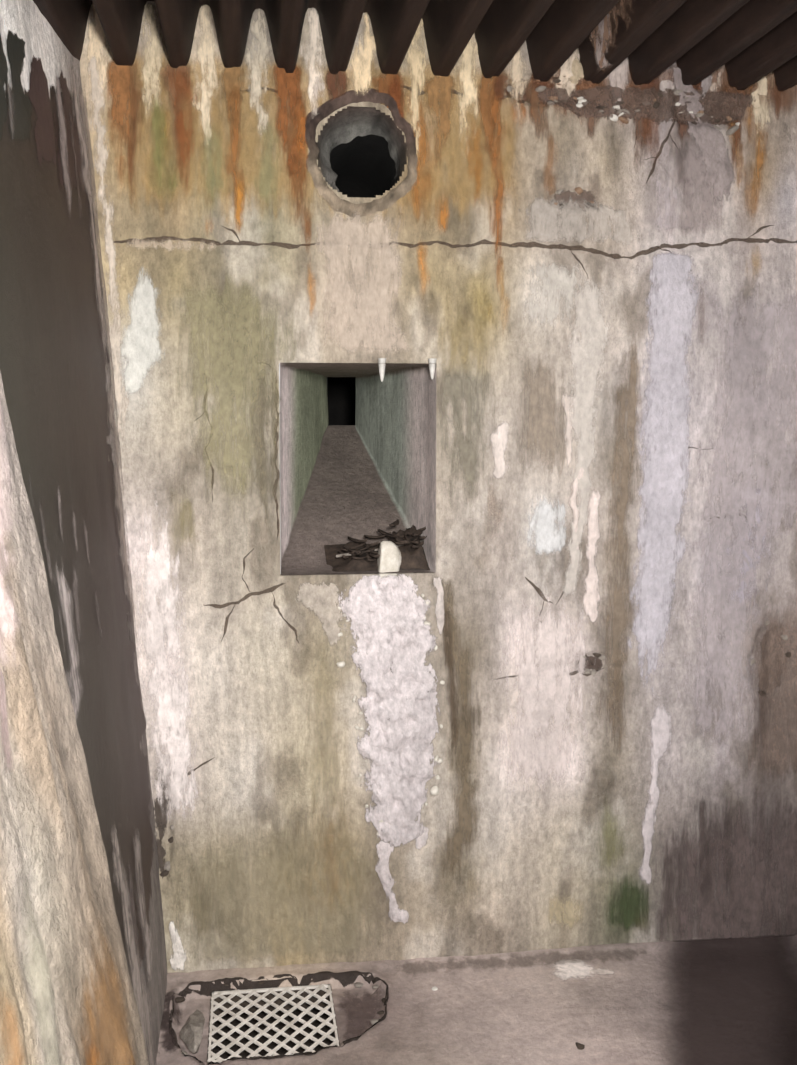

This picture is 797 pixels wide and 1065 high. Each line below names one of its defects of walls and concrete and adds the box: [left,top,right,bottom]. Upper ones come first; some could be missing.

corrosion [108,60,140,181]
corrosion [274,67,310,237]
corrosion [469,73,507,250]
corrosion [513,67,676,187]
spalling [505,77,755,136]
crack [113,225,797,277]
peeling [0,30,174,990]
crack [204,548,299,643]
crack [258,362,280,538]
water stain [499,253,704,783]
water stain [297,574,477,924]
water stain [639,706,797,1065]